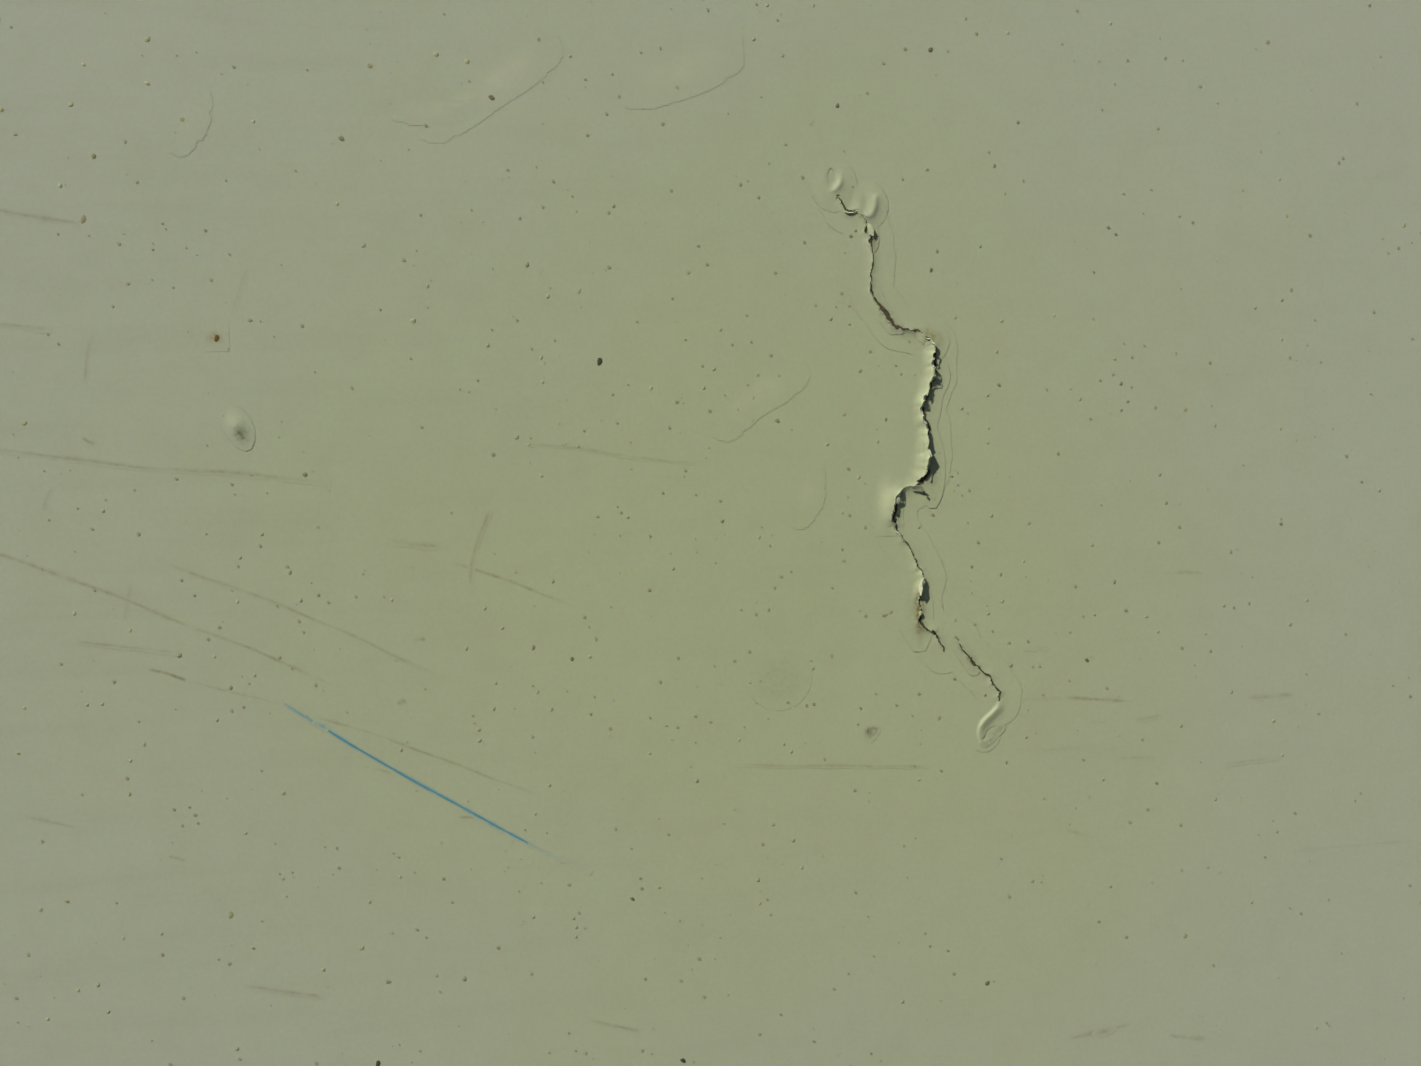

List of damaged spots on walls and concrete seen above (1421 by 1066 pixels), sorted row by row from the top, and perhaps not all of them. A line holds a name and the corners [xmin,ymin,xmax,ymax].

crack [816,174,1022,752]